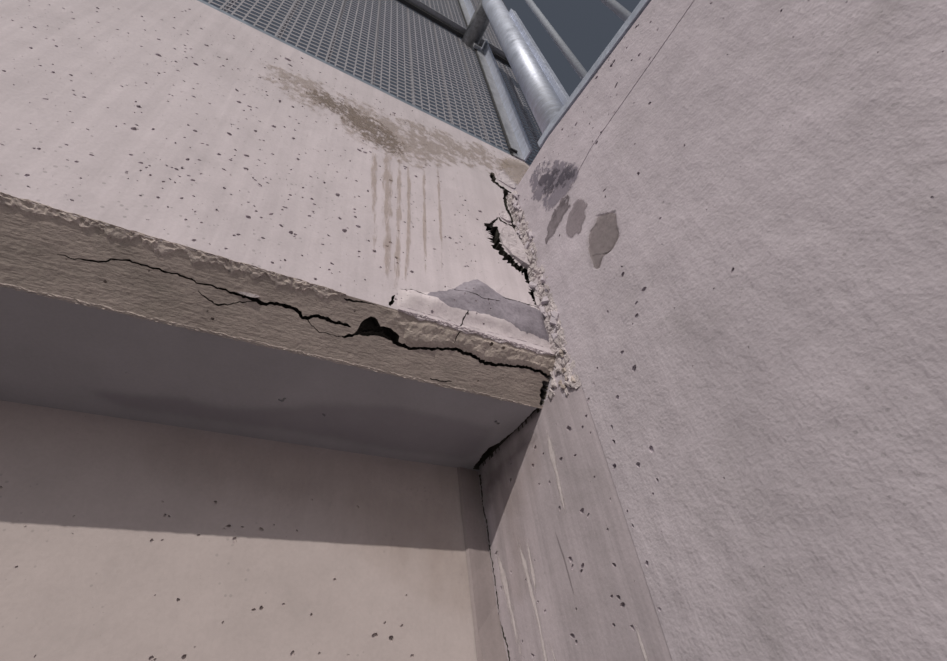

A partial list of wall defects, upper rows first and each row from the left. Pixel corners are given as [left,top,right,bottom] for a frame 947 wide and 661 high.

crack [57,173,550,661]
spalling [357,160,619,399]